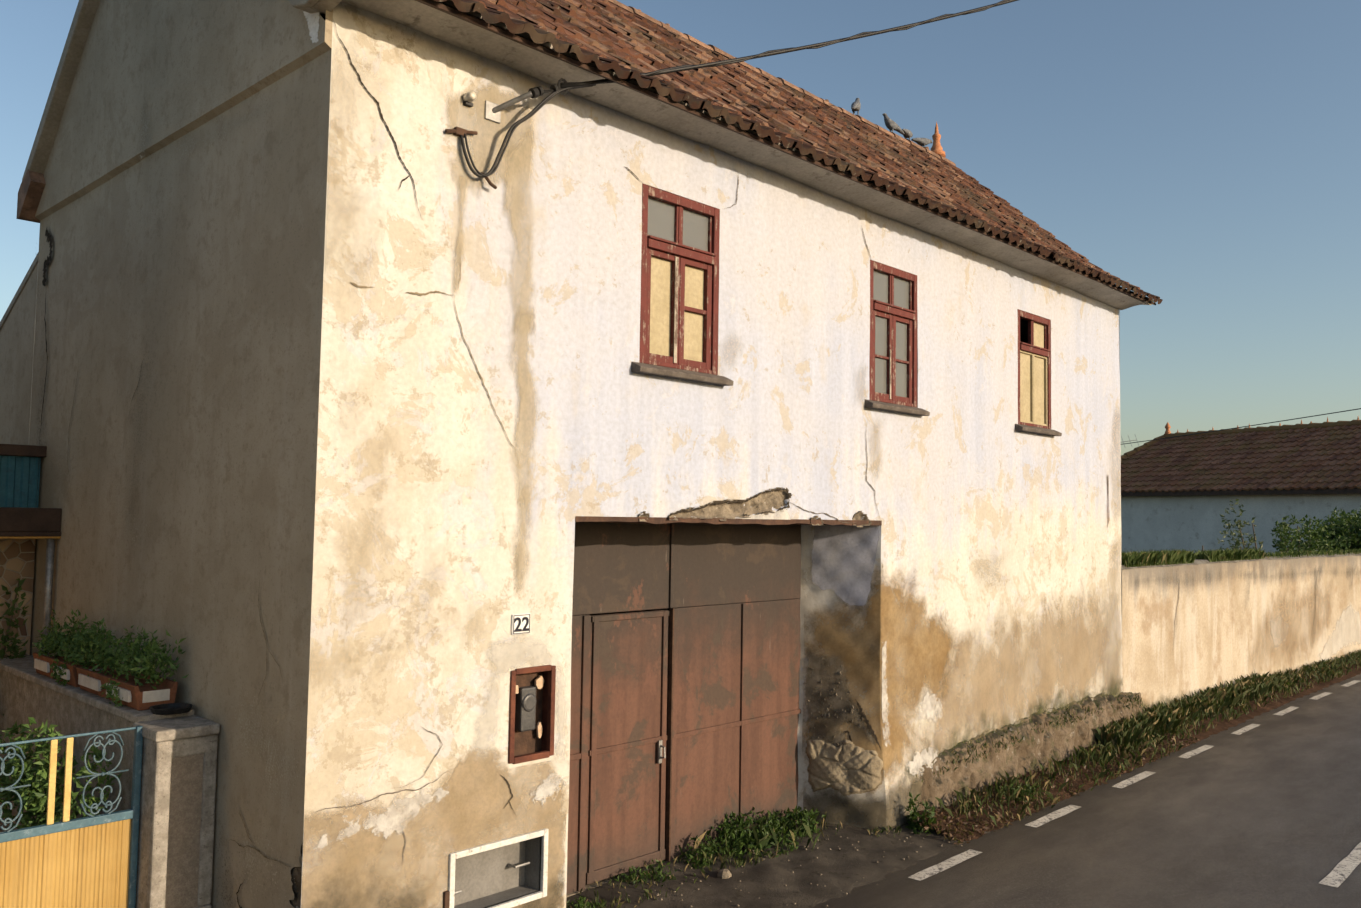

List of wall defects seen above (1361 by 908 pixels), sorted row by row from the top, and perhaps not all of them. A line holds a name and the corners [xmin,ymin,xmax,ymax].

crack [333,20,421,216]
damp [449,84,536,466]
crack [350,263,519,464]
damp [516,483,530,588]
spalling [668,487,792,521]
peeling [810,511,883,606]
spalling [805,642,889,754]
damp [802,571,1120,831]
crack [314,729,452,865]
peeling [289,750,567,908]
damp [523,883,565,908]